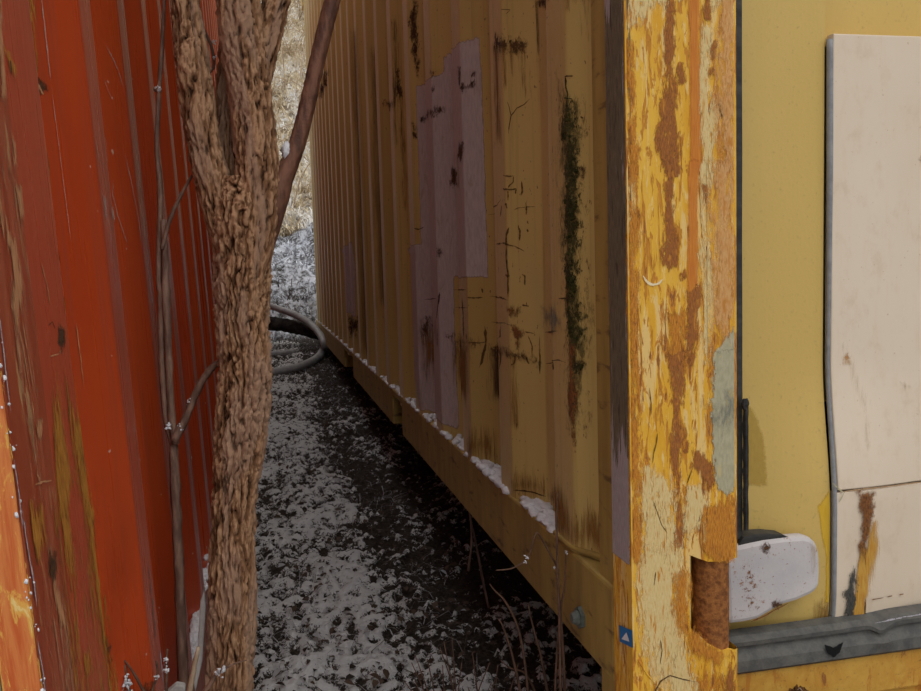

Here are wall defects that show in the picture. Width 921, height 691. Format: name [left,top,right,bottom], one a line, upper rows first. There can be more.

rust [494,36,526,134]
rust [654,0,687,281]
rust [703,0,715,22]
rust [708,40,718,77]
peeling [605,0,735,496]
rust [666,283,715,548]
peeling [634,462,709,691]
rust [671,571,735,691]
rust [701,500,788,622]
rust [853,490,880,615]